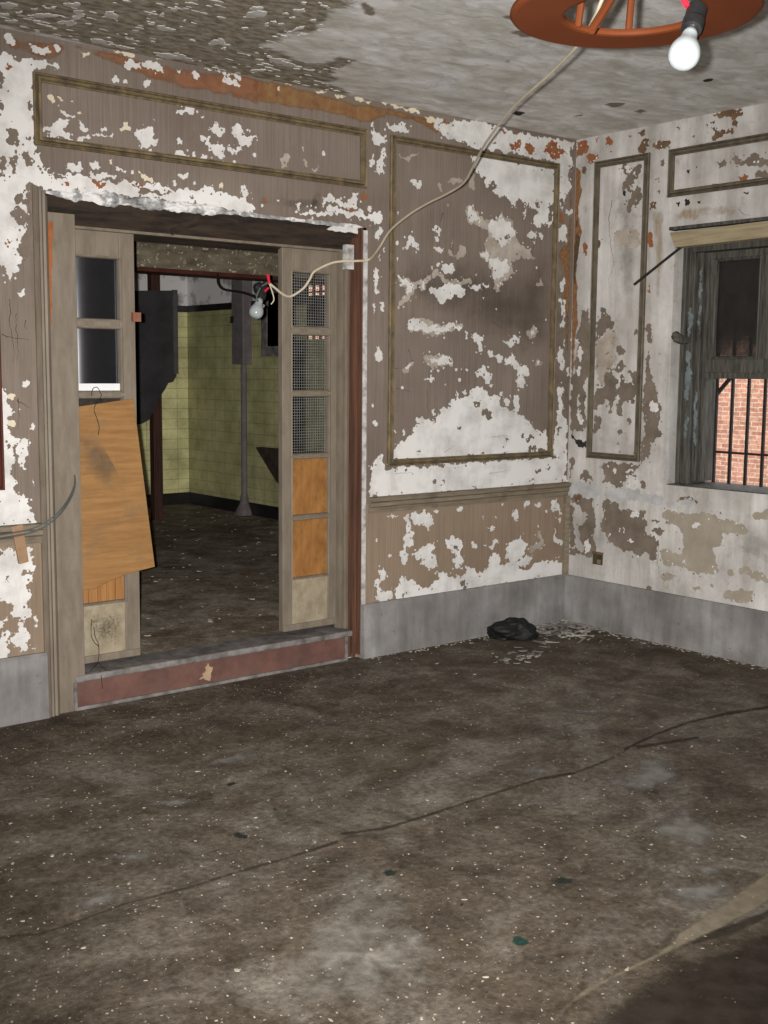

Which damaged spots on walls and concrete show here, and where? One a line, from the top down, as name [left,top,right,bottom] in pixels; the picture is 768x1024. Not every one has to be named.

rust [10,40,62,57]
rust [96,52,438,133]
peeling [0,0,768,603]
rust [556,151,590,435]
peeling [0,547,38,658]